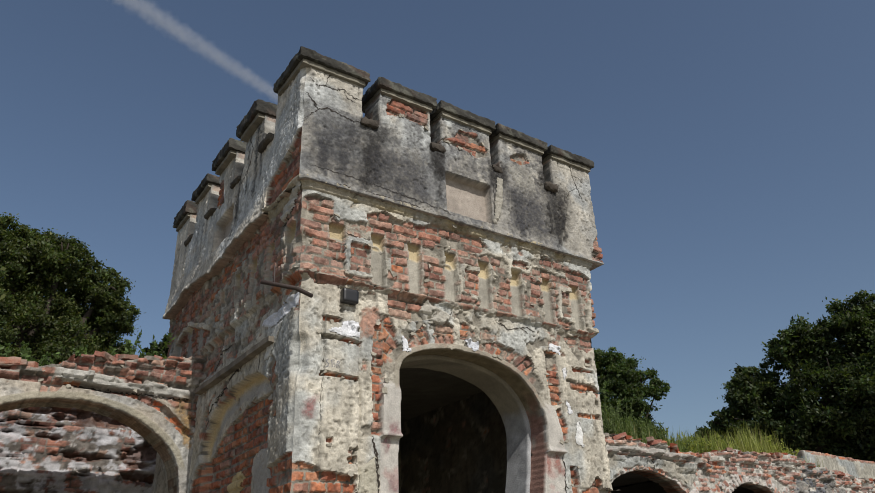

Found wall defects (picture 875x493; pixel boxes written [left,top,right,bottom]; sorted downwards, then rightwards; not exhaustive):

crack [305,75,362,122]
spalling [385,98,429,131]
damp [360,126,427,200]
damp [431,151,445,200]
damp [488,160,569,244]
spalling [261,127,489,360]
spalling [77,325,210,371]
spalling [316,251,601,448]
spalling [38,366,194,438]
spalling [189,390,274,493]
spalling [266,451,358,493]
crack [356,436,380,493]